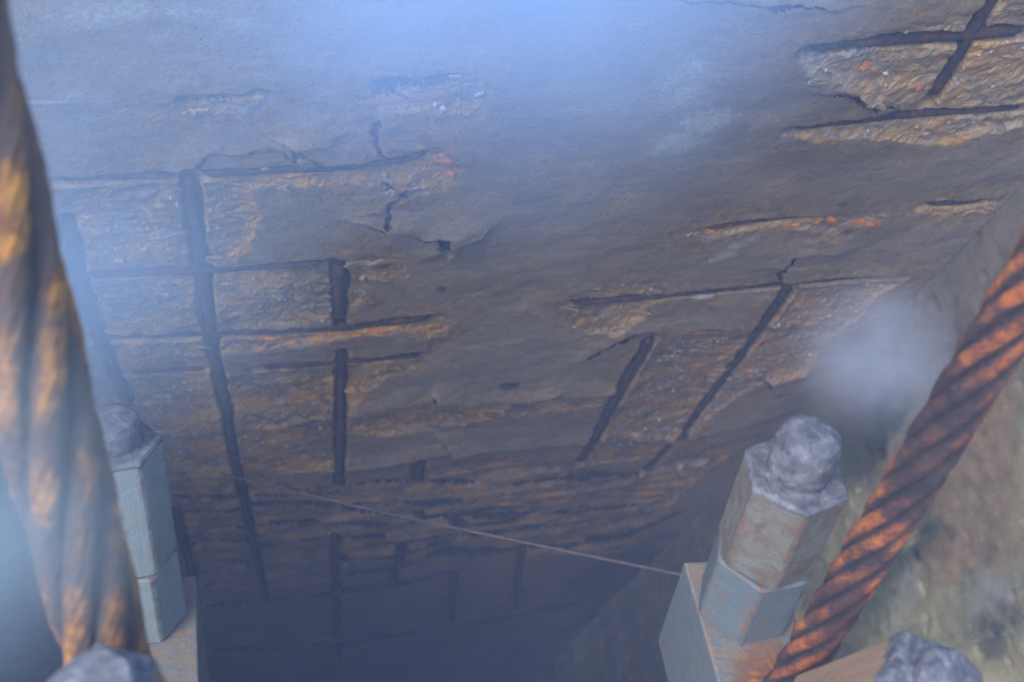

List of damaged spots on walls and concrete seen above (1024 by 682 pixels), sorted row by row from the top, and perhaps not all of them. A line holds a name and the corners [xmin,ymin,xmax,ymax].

spalling [797,0,1024,145]
crack [371,120,408,234]
crack [420,240,462,253]
crack [776,256,830,282]
spalling [912,197,1000,218]
spalling [91,149,906,591]